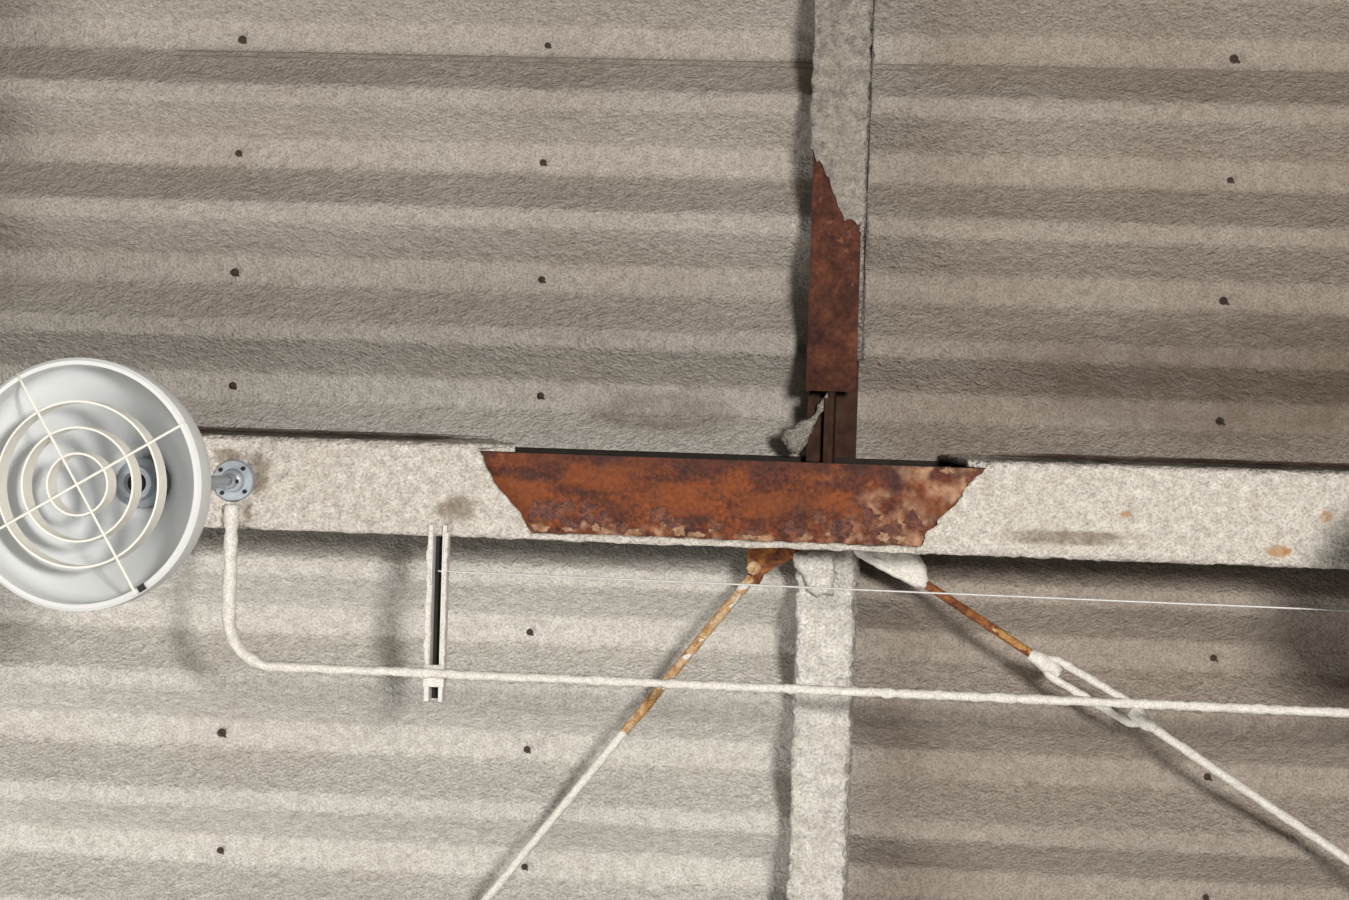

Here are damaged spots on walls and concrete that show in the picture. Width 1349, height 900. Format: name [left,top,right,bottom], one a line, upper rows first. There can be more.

corrosion [620,574,754,735]
corrosion [925,581,1033,657]